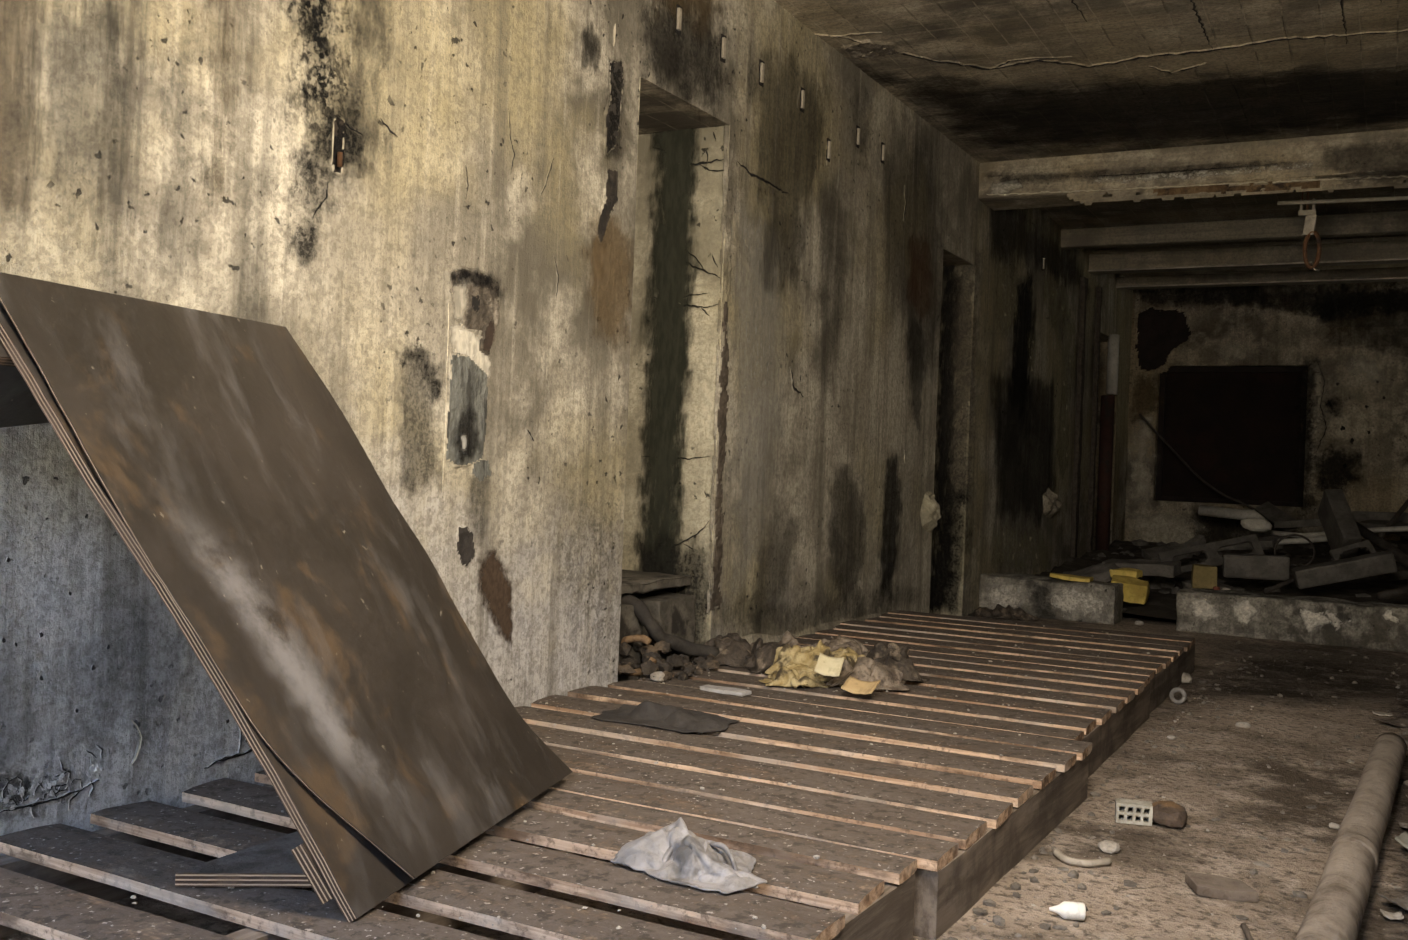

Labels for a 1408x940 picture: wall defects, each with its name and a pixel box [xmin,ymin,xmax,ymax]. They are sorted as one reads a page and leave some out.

crack [774,0,1408,74]
spalling [444,266,503,482]
rust [478,550,513,642]